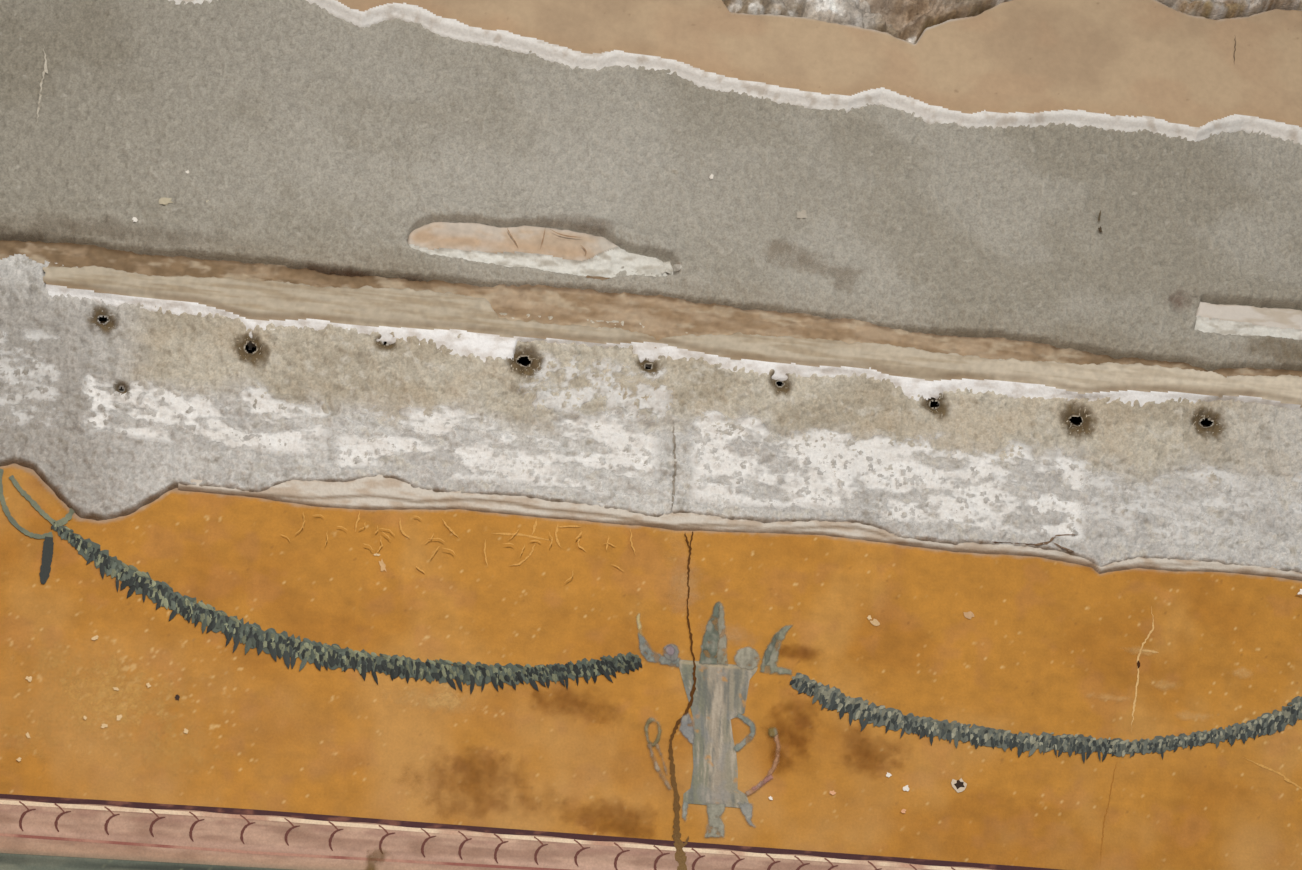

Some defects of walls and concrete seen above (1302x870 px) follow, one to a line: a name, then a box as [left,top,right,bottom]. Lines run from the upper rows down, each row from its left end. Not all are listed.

spalling [306,0,1302,145]
spalling [409,244,682,278]
spalling [0,254,1302,597]
crack [668,427,697,870]